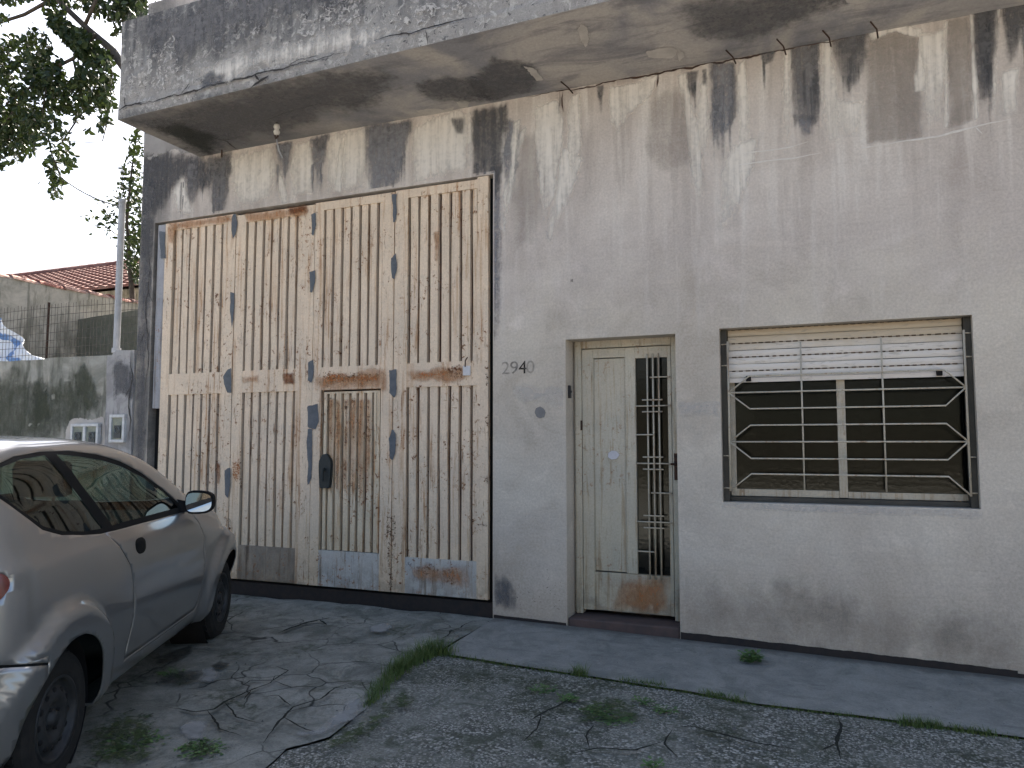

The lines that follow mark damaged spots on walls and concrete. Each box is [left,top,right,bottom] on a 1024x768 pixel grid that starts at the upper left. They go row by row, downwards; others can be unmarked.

leakage [690,0,840,39]
crack [118,52,345,111]
leakage [762,22,949,139]
leakage [970,5,1024,118]
leakage [679,60,756,217]
leakage [136,59,581,460]
leakage [75,366,98,409]
rust [322,371,385,489]
crack [279,617,332,633]
crack [170,666,360,743]
crack [523,699,569,742]